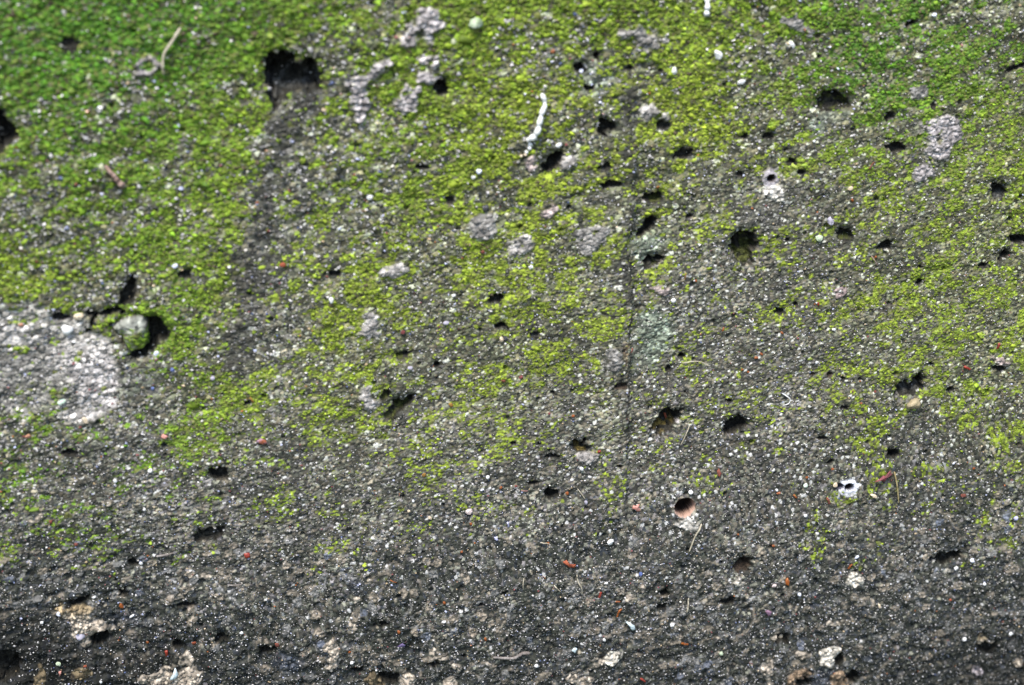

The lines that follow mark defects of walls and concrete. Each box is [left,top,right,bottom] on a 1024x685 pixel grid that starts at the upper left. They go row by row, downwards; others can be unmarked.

damp [211,78,330,382]
damp [586,76,659,409]
damp [715,188,796,242]
damp [121,355,166,406]
damp [611,455,638,527]